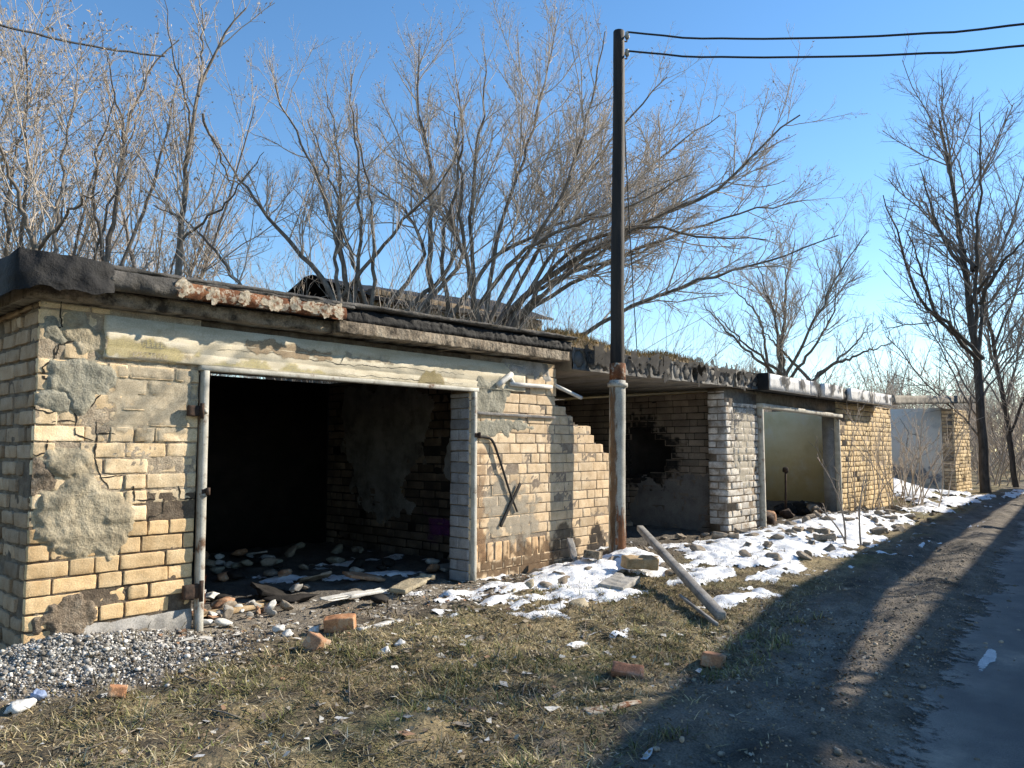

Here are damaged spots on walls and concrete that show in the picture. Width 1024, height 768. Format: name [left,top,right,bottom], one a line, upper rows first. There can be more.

peeling [246,339,332,361]
crack [31,395,122,489]
spalling [28,456,57,503]
spalling [31,591,98,636]